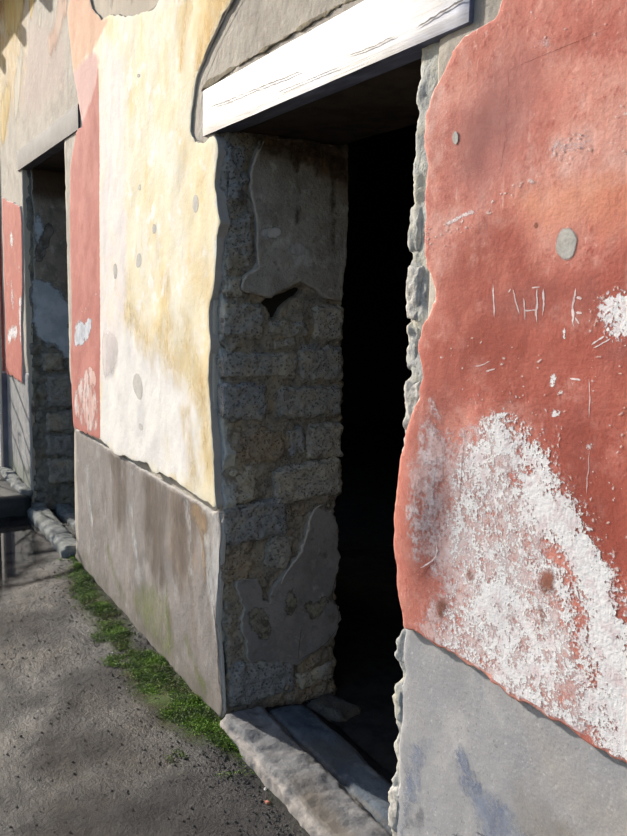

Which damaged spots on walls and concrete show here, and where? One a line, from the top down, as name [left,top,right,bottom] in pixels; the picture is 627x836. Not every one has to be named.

spalling [34,223,54,262]